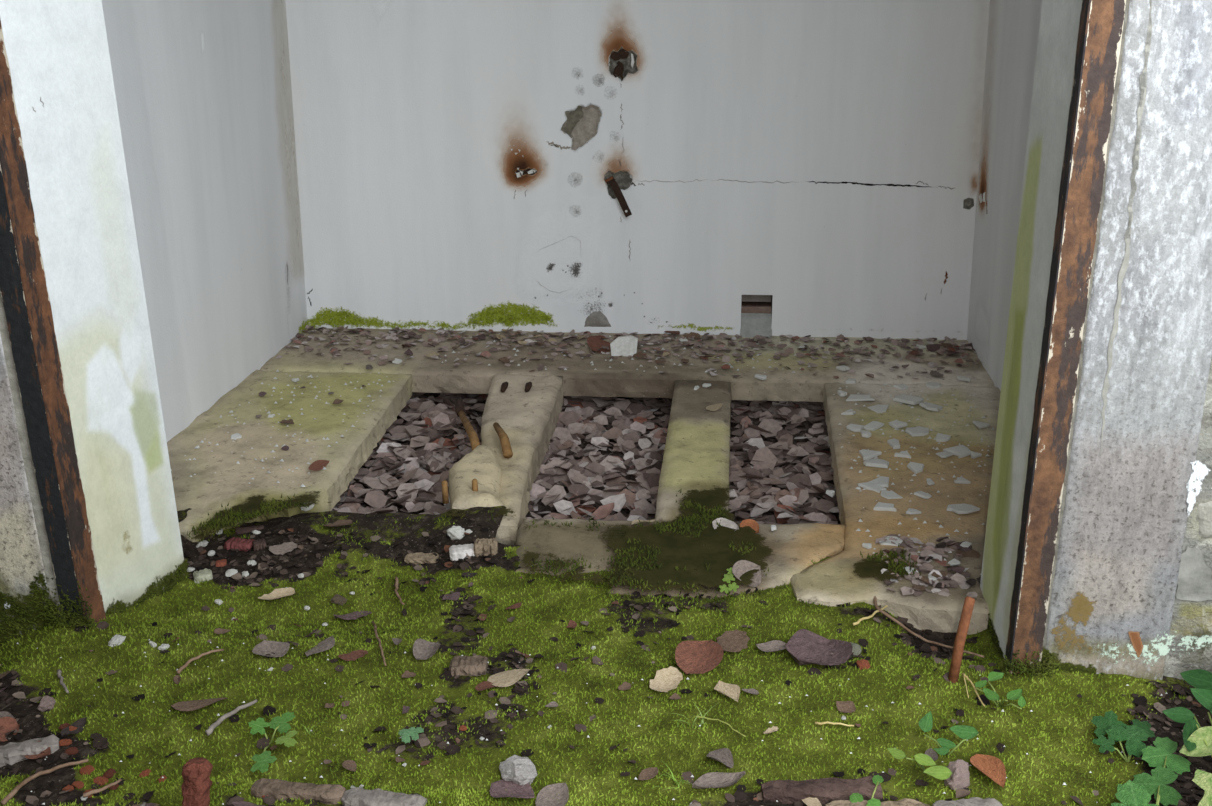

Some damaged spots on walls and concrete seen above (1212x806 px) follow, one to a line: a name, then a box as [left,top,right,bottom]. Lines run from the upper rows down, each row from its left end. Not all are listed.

rust [602,27,641,67]
rust [503,138,543,198]
spalling [546,105,602,150]
rust [606,158,629,173]
crack [619,83,954,190]
rust [972,155,987,214]